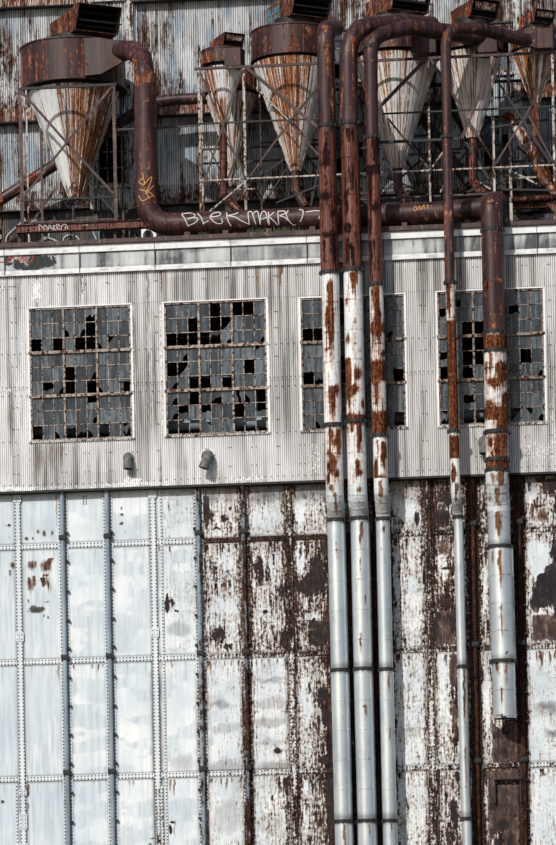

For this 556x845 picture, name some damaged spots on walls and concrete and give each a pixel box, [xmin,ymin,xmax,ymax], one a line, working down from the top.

corrosion [27,558,53,590]
peeling [253,541,328,602]
peeling [530,539,556,641]
peeling [301,617,330,649]